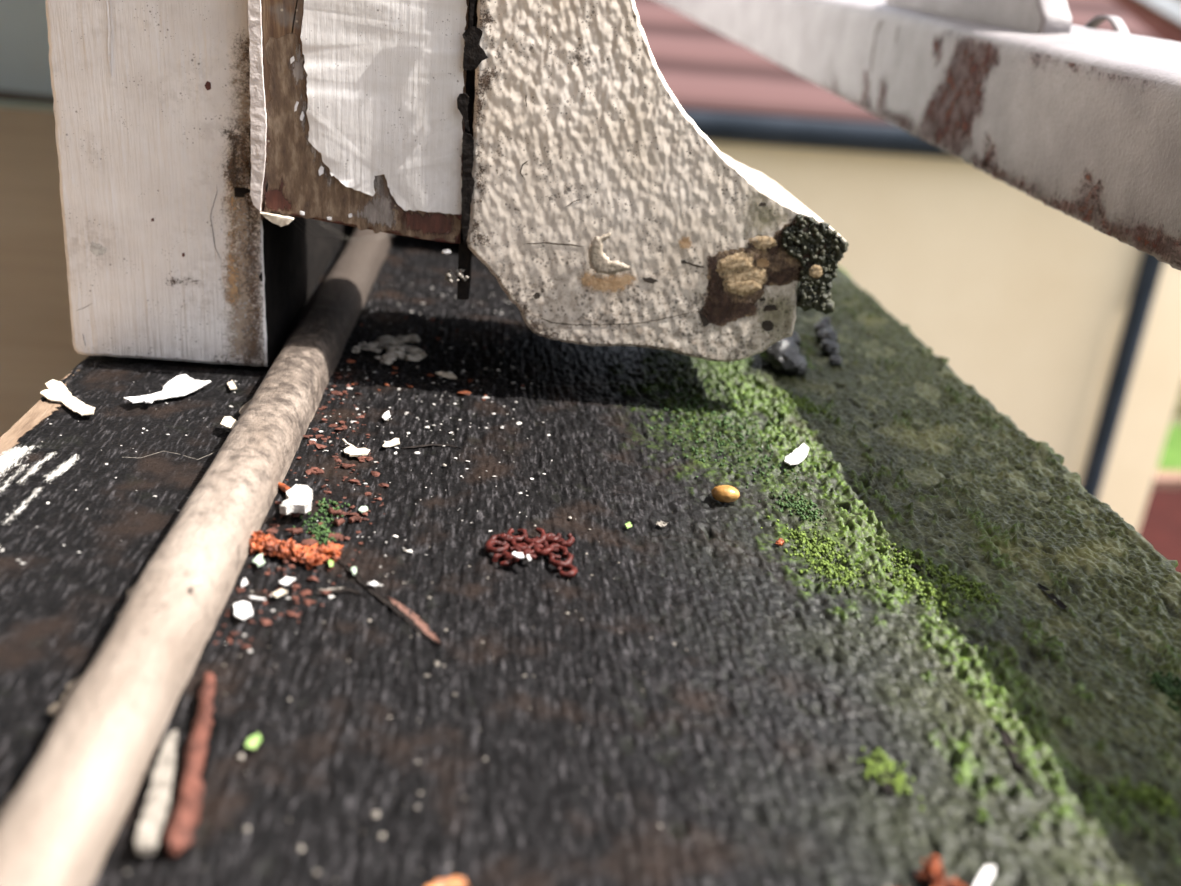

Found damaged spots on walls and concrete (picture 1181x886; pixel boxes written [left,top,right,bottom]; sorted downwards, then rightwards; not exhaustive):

peeling [0,370,95,525]
peeling [123,374,211,403]
damp [211,34,265,366]
peeling [264,33,461,255]
damp [499,275,738,363]
peeling [698,214,843,331]
rust [822,31,1181,267]